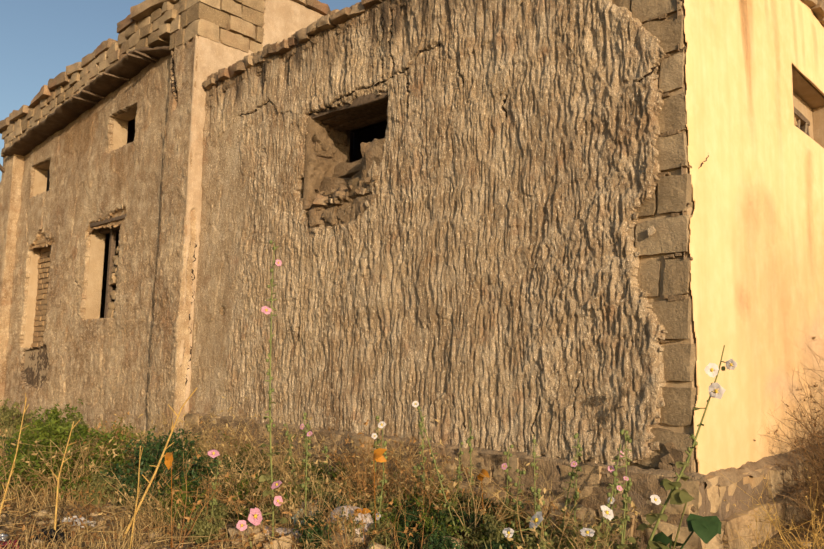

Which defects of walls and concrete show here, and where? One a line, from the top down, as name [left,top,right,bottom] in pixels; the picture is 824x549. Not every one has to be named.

crack [309,13,440,115]
flaking render [86,204,126,238]
flaking render [307,187,372,233]
flaking render [613,0,698,474]
flaking render [20,341,49,391]